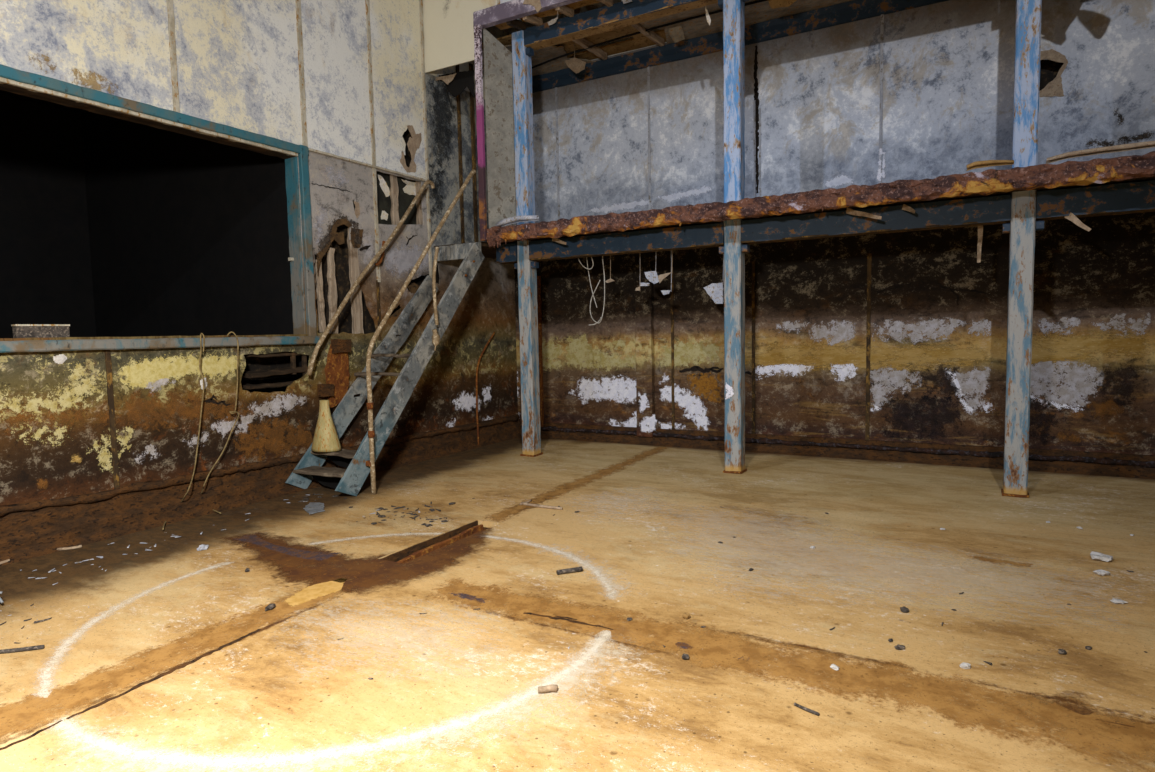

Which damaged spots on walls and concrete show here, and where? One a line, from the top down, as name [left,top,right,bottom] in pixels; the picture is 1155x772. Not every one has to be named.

spalling [1039,60,1064,91]
spalling [403,128,422,167]
rust [850,189,928,206]
spalling [315,224,376,334]
peeling [0,354,107,447]
peeling [116,425,137,459]
leakage [133,444,158,463]
leakage [182,393,307,447]
spalling [241,352,298,393]
leakage [542,333,722,433]
leakage [745,317,993,440]
leakage [1029,313,1151,443]